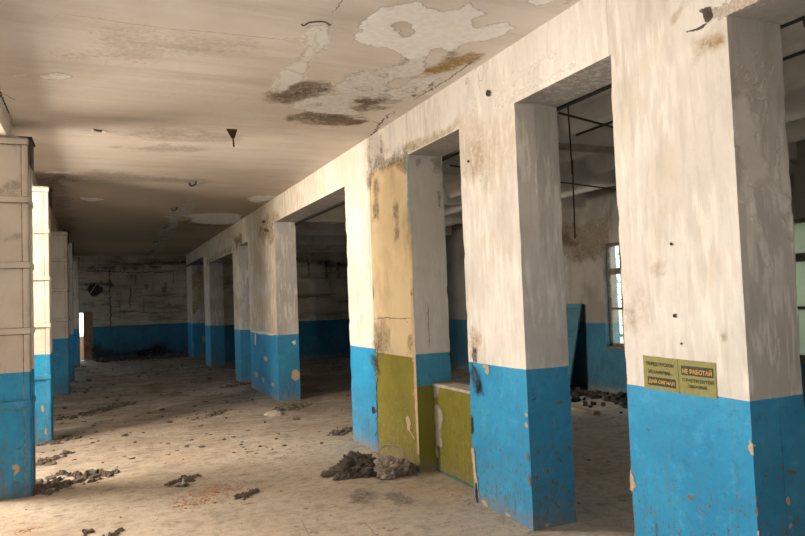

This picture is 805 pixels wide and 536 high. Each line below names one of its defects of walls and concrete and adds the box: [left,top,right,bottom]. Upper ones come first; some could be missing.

leakage [268,25,330,103]
peeling [289,1,515,116]
leakage [288,98,385,126]
peeling [433,386,443,458]
spalling [436,448,488,507]